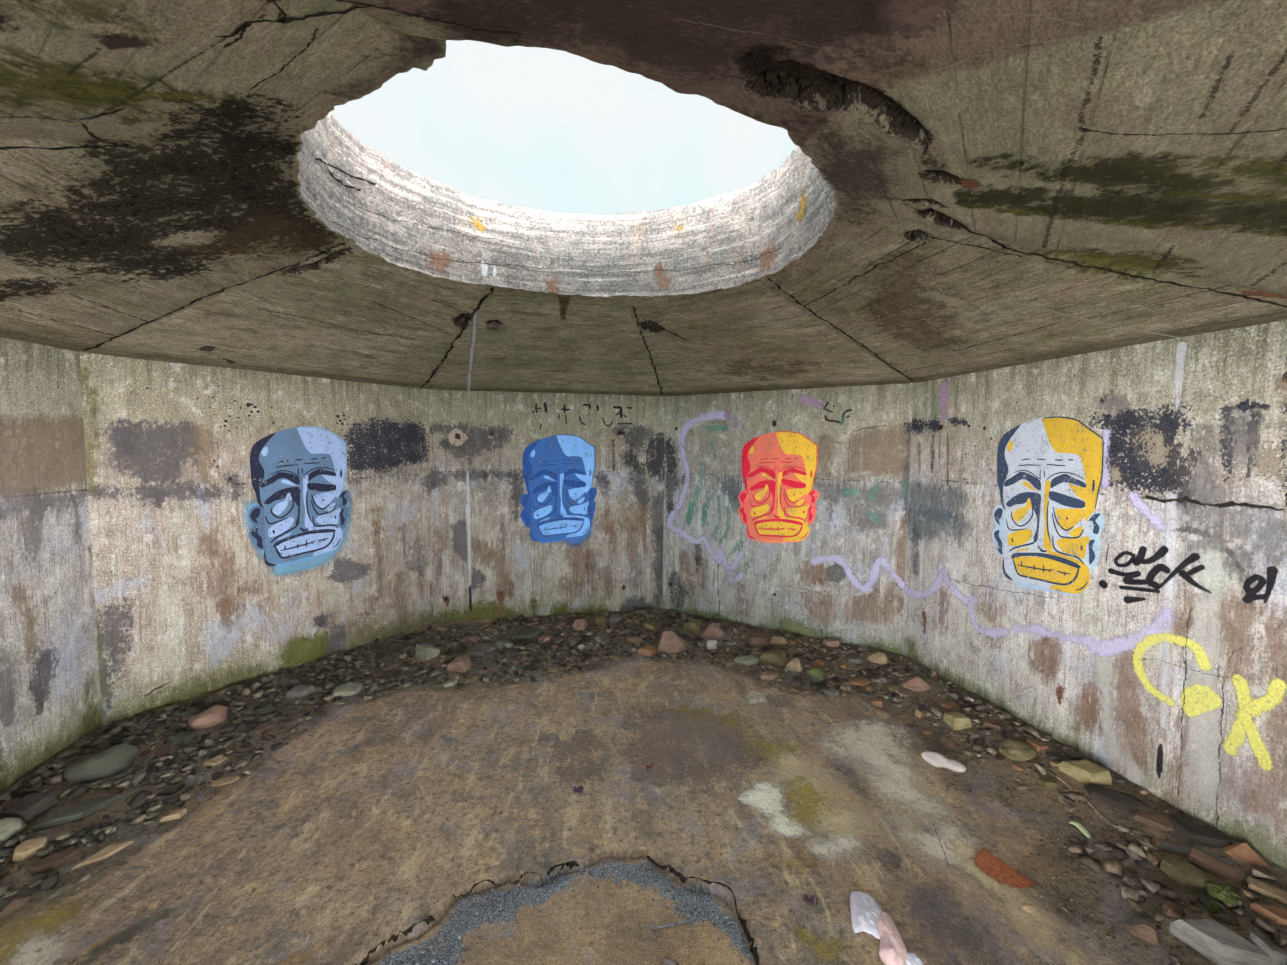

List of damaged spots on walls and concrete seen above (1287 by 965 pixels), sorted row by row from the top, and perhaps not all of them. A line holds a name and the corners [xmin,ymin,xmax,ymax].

crack [214,0,522,90]
crack [0,107,138,150]
spalling [736,45,983,188]
crack [1077,127,1287,136]
damp [0,94,346,302]
spalling [894,199,969,243]
damp [954,152,1287,233]
crack [83,158,1287,476]
crack [1146,492,1287,511]
crack [354,860,579,965]
crack [646,815,759,965]